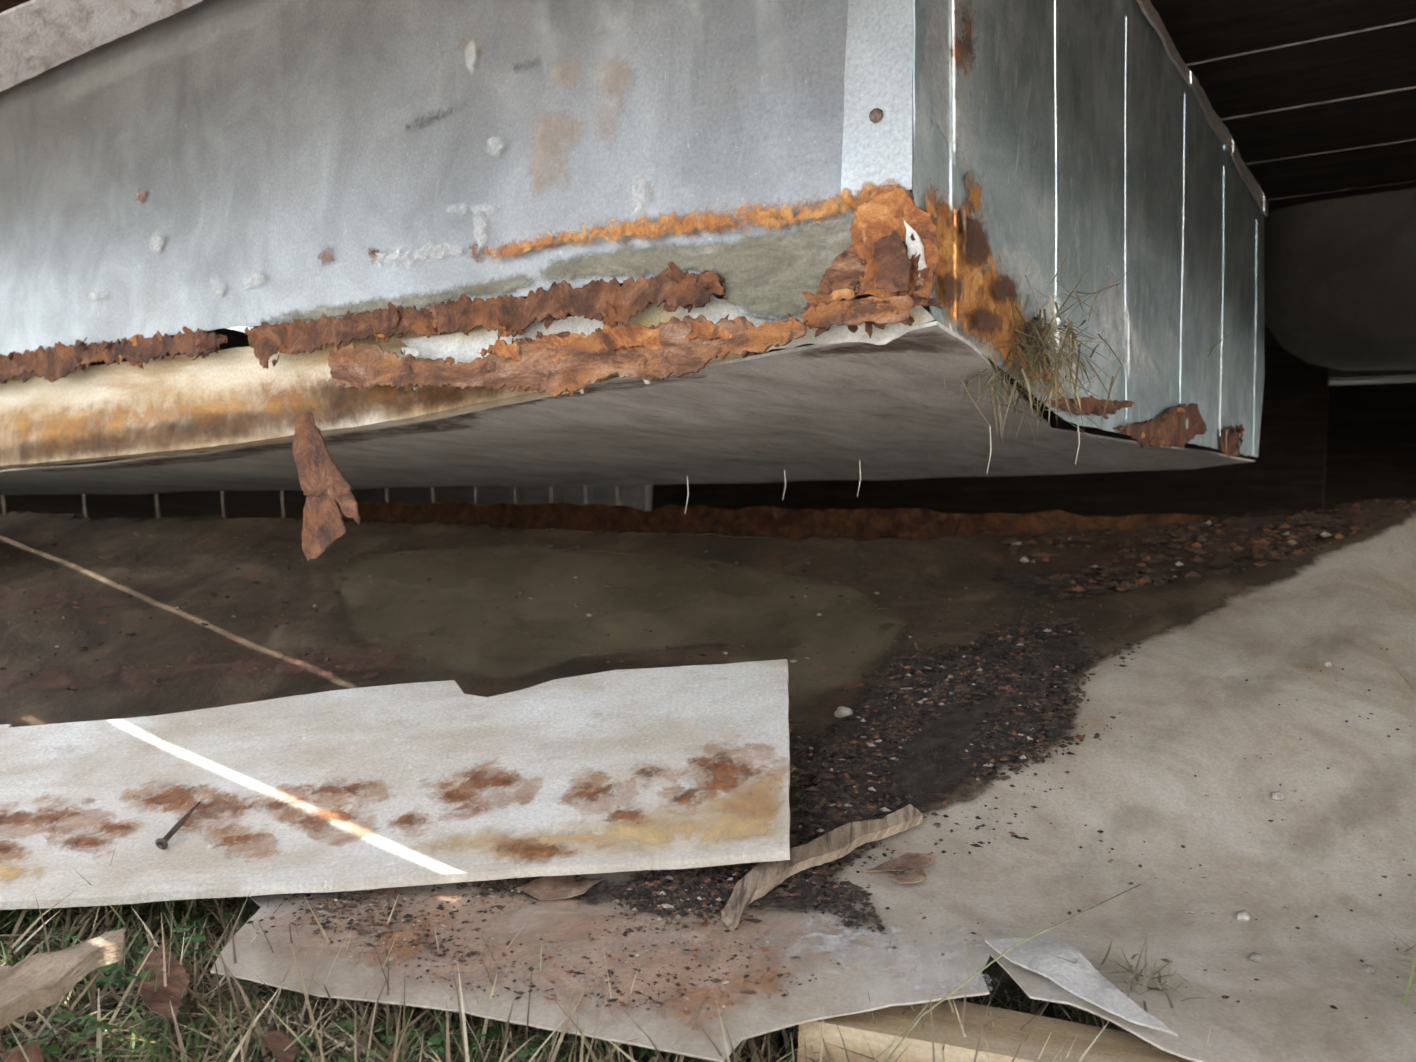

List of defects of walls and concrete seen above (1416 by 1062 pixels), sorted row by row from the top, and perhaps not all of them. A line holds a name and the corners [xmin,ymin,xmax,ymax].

rust [0,0,1088,410]
rust [93,411,477,561]